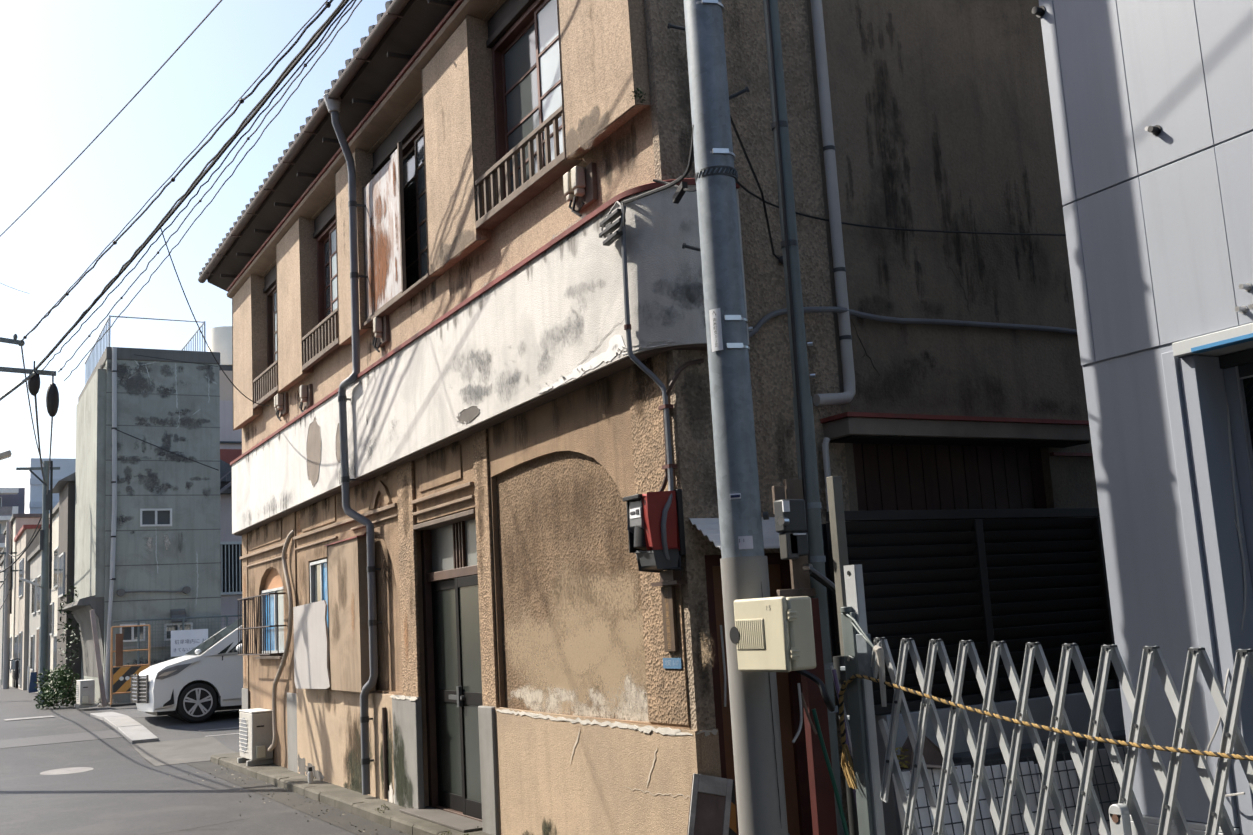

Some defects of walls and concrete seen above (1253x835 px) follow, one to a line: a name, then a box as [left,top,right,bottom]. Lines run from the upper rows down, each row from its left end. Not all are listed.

corrosion [369,163,398,314]
damp [325,689,412,808]